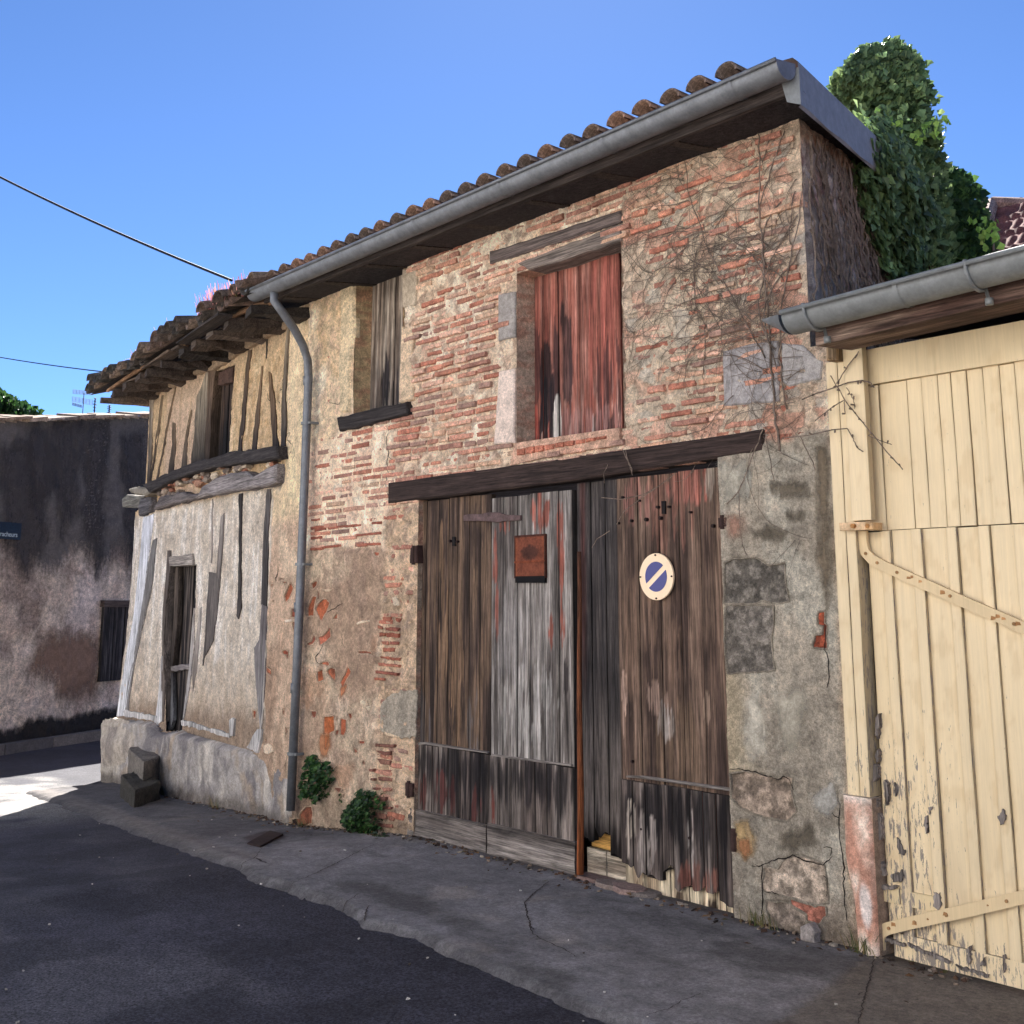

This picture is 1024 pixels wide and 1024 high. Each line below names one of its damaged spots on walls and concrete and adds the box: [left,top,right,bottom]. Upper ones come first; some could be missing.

water stain [0,417,149,578]
water stain [32,628,99,699]
flaking render [270,577,338,647]
flaking render [316,660,352,687]
flaking render [811,609,828,651]
peeling [873,713,906,856]
peeling [923,806,933,834]
crack [524,882,575,956]
crack [751,800,847,921]
peeling [881,861,905,890]
peeling [933,892,942,910]
peeling [885,936,990,978]